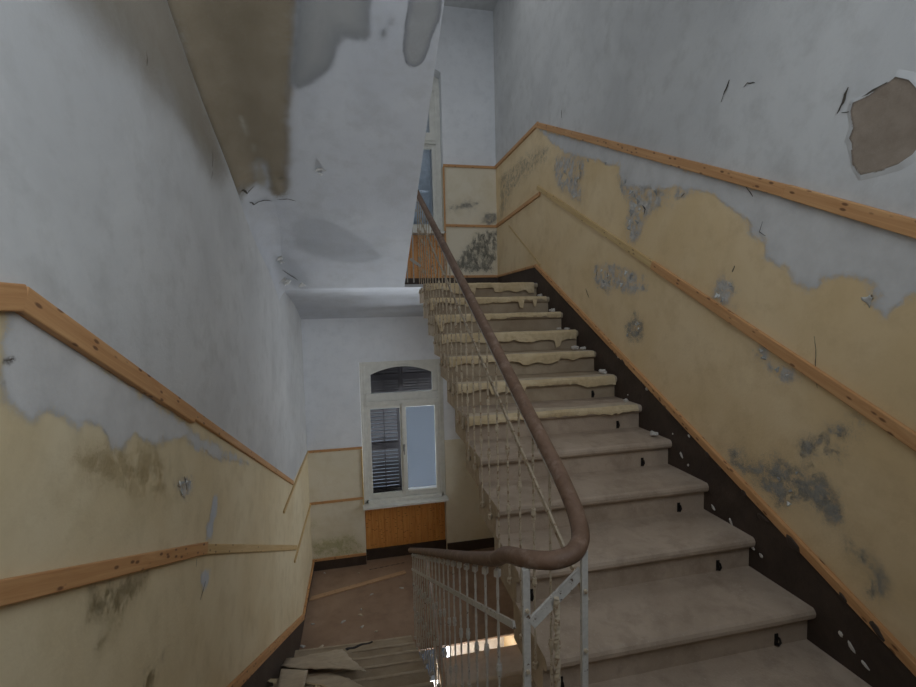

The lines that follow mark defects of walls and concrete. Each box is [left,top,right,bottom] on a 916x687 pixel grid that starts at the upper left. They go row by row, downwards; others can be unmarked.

leakage [167,0,443,205]
leakage [446,148,549,275]
spalling [837,69,916,181]
leakage [718,409,901,610]